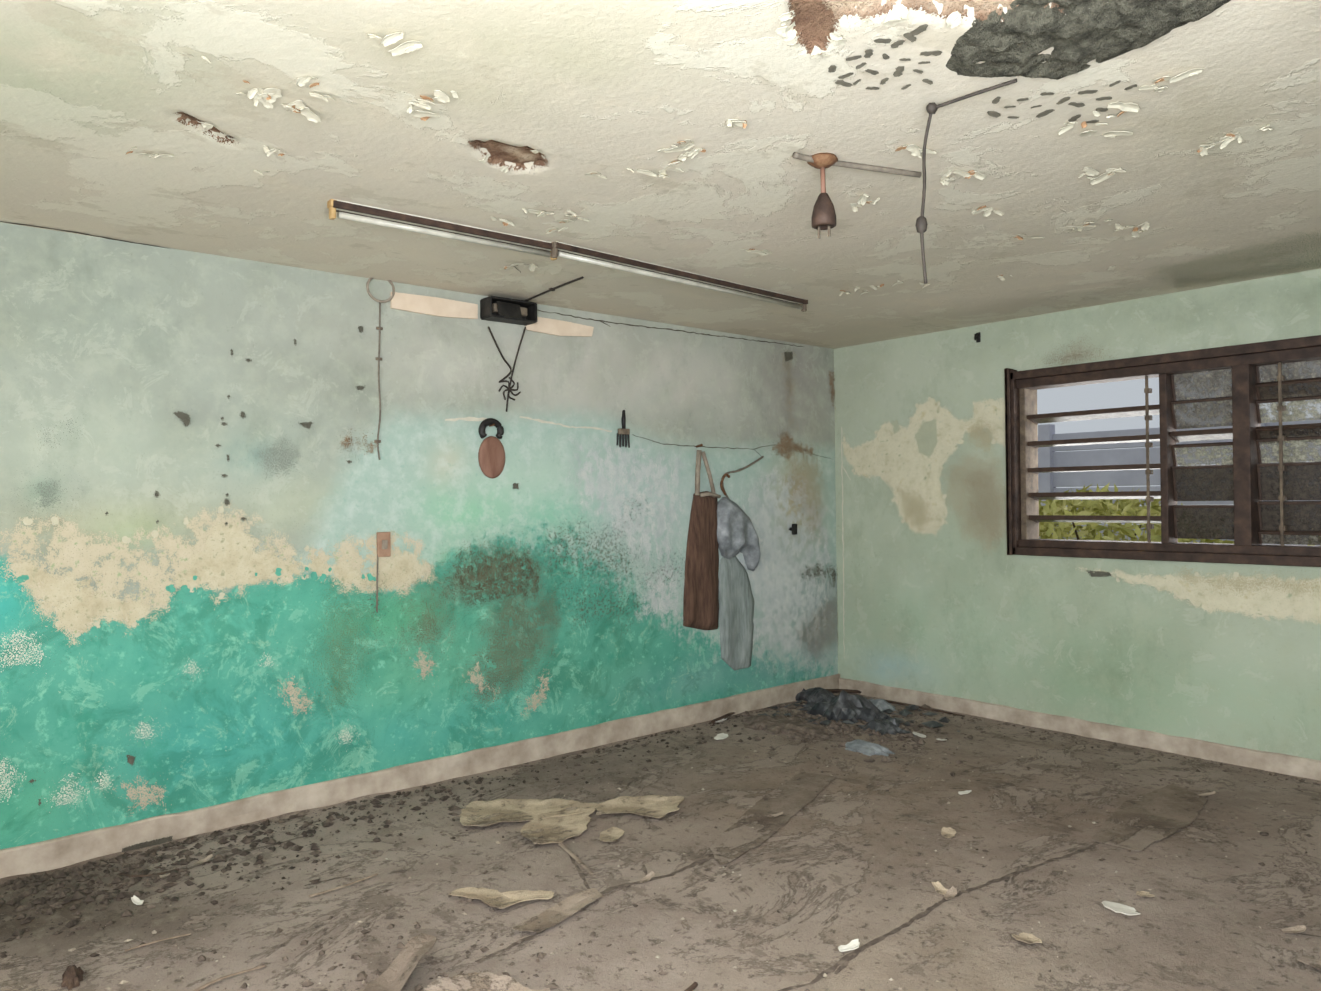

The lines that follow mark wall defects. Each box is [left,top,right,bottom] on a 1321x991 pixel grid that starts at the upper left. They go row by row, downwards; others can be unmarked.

spalling [775,0,1075,59]
spalling [468,140,549,173]
peeling [842,397,1005,537]
peeling [0,444,436,674]
leakage [299,429,693,719]
peeling [1075,565,1321,626]